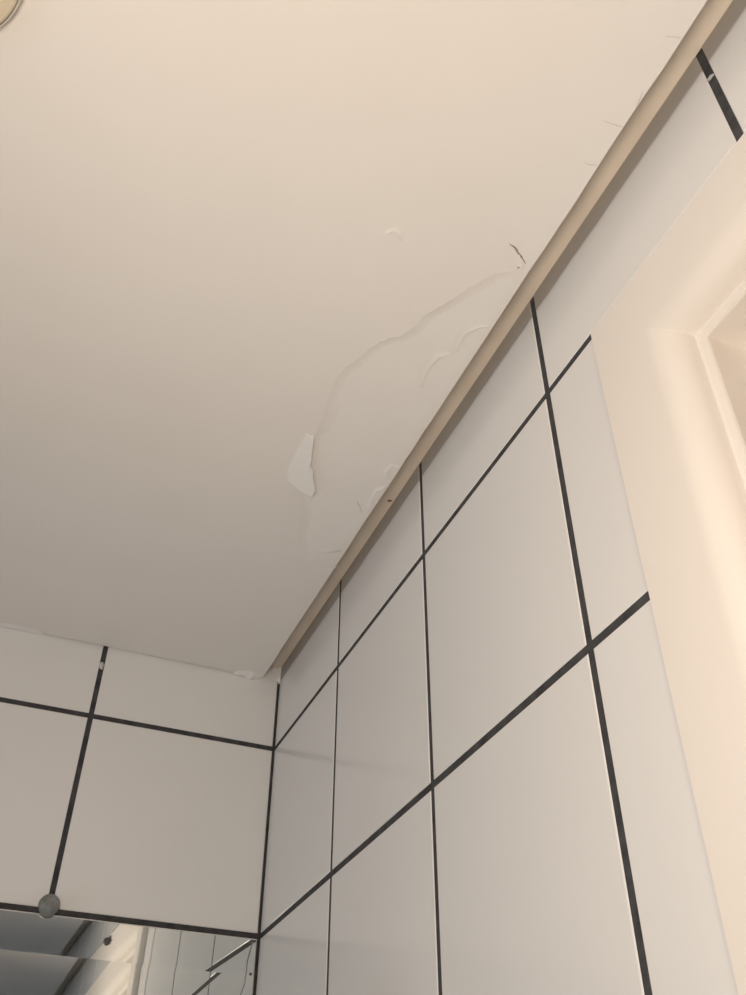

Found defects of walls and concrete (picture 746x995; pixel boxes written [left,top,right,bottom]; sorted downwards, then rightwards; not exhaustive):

peeling [288,268,520,570]